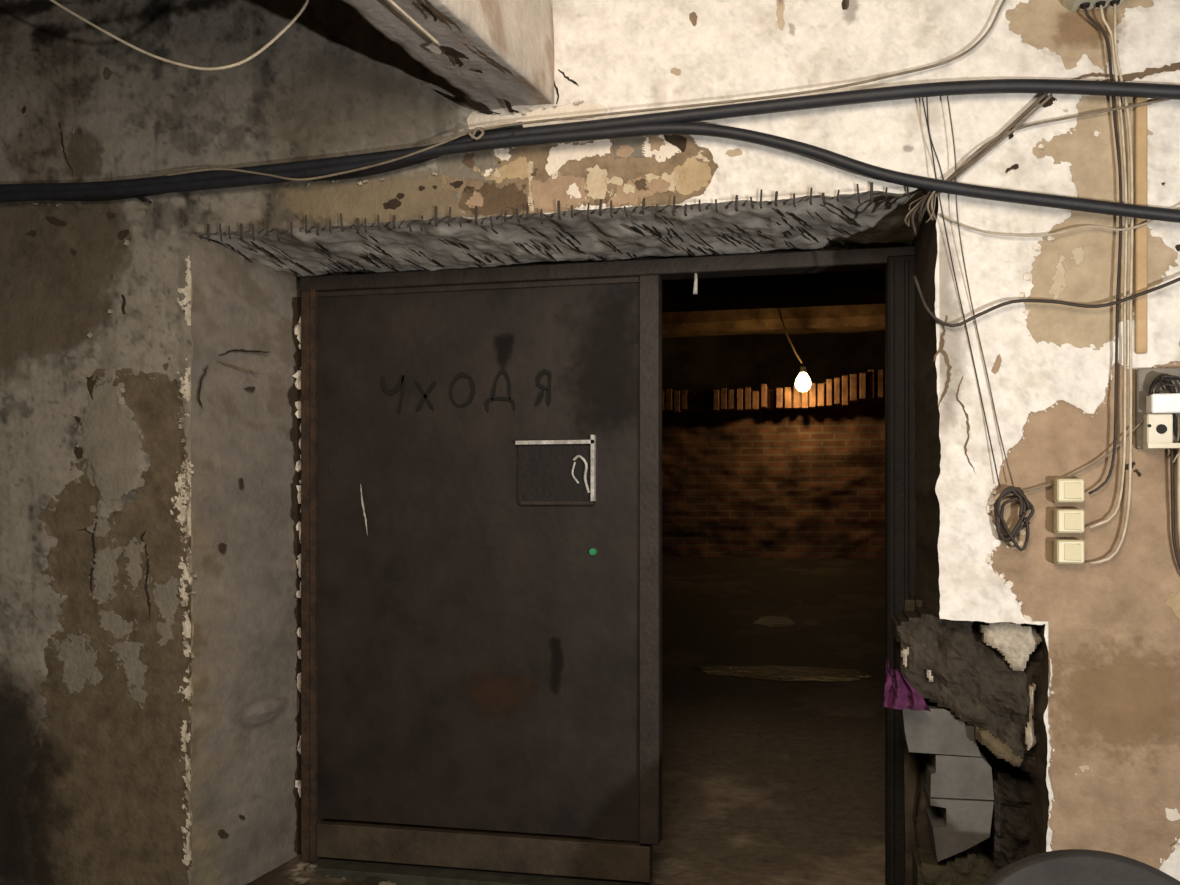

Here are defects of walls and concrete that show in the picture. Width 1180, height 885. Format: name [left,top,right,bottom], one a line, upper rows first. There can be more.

flaking render [1006,0,1154,74]
crack [1073,62,1180,82]
peeling [207,135,742,277]
spalling [724,182,888,253]
flaking render [1019,95,1180,350]
spalling [991,355,1002,374]
flaking render [30,358,197,885]
flaking render [986,363,1180,870]